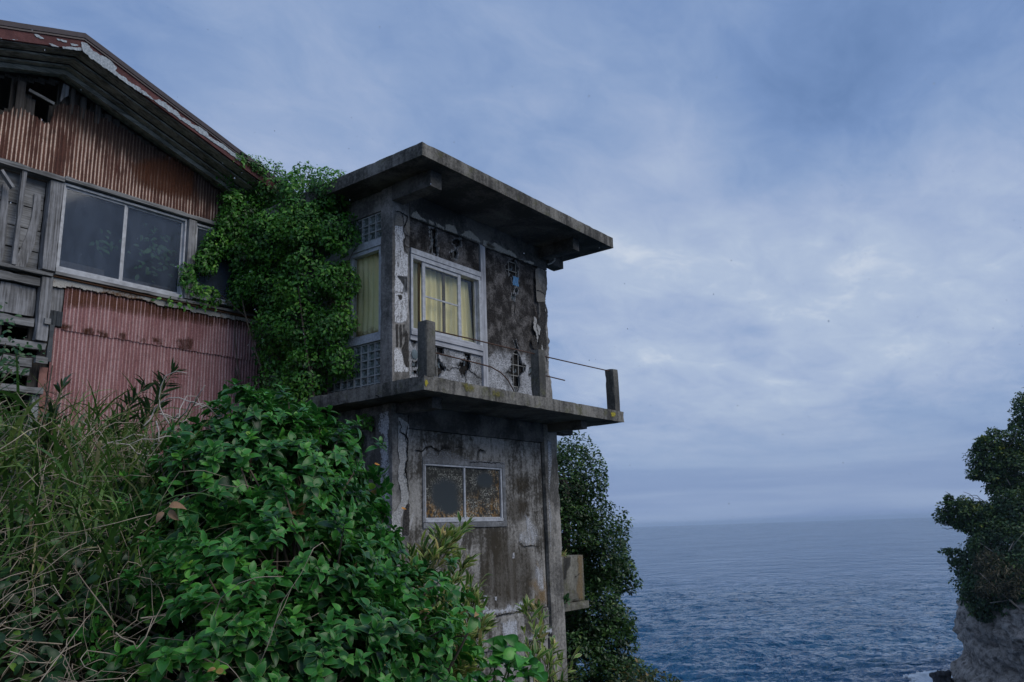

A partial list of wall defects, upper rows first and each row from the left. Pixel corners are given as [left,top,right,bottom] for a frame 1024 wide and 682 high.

peeling [34,34,242,161]
corrosion [131,154,196,199]
peeling [394,213,418,376]
flaking render [428,227,462,260]
flaking render [435,345,472,377]
damp [481,478,544,635]